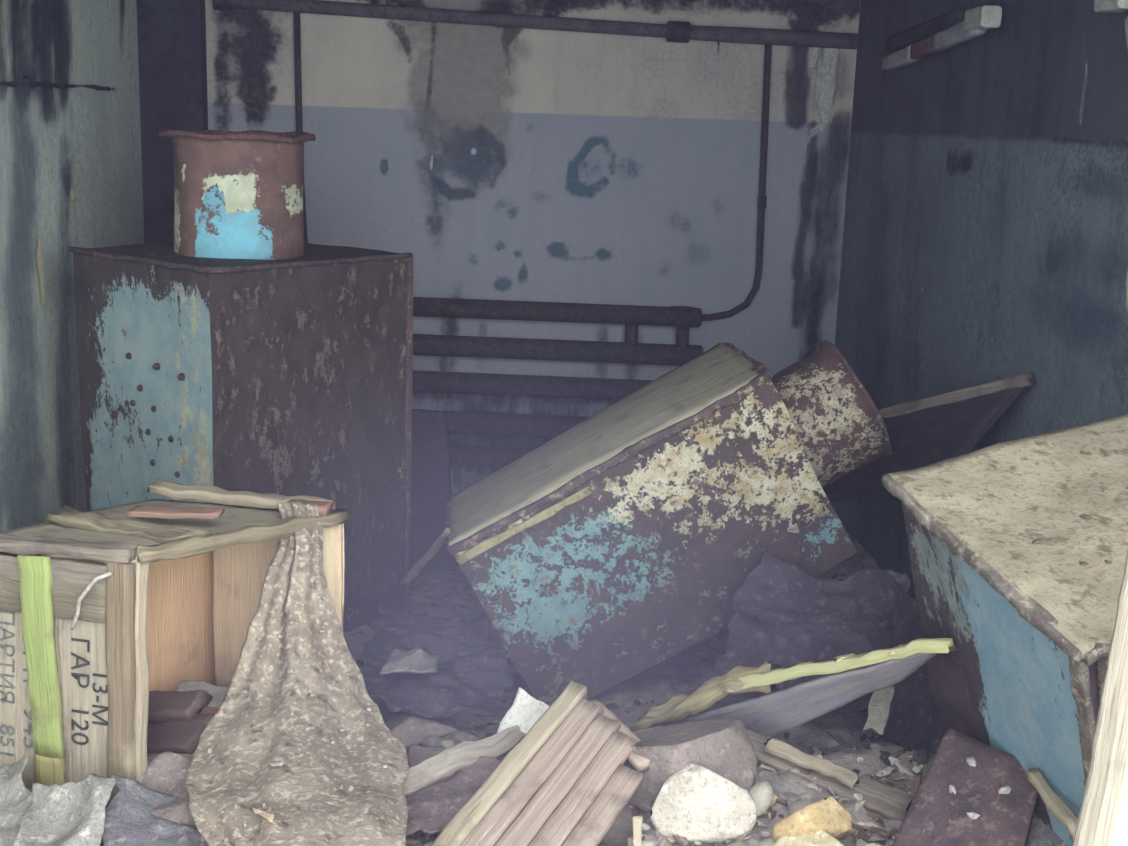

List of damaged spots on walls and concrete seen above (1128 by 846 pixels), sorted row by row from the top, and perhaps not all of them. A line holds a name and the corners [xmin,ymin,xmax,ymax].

leakage [0,0,72,529]
leakage [215,8,282,130]
leakage [495,245,527,290]
leakage [548,243,568,257]
leakage [369,0,860,223]
leakage [786,46,850,358]